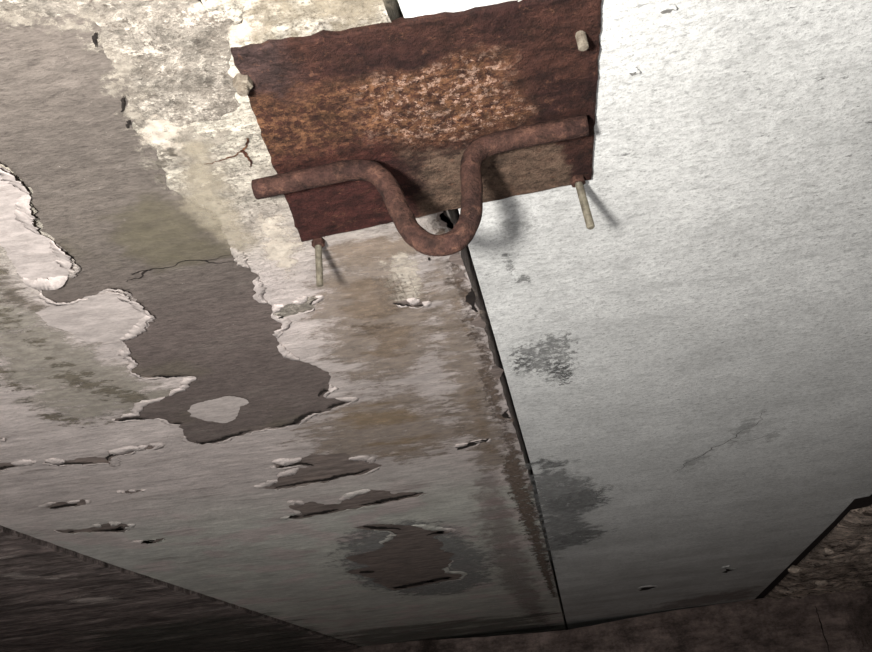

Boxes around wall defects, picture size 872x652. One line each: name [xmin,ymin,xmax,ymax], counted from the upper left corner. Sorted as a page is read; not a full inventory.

peeling [0,0,359,445]
spalling [435,211,454,235]
water stain [379,252,421,306]
water stain [0,269,171,428]
peeling [0,442,165,472]
peeling [254,453,382,490]
peeling [280,489,427,520]
spalling [445,252,557,598]
water stain [525,459,610,561]
peeling [346,524,468,590]
water stain [331,522,496,596]